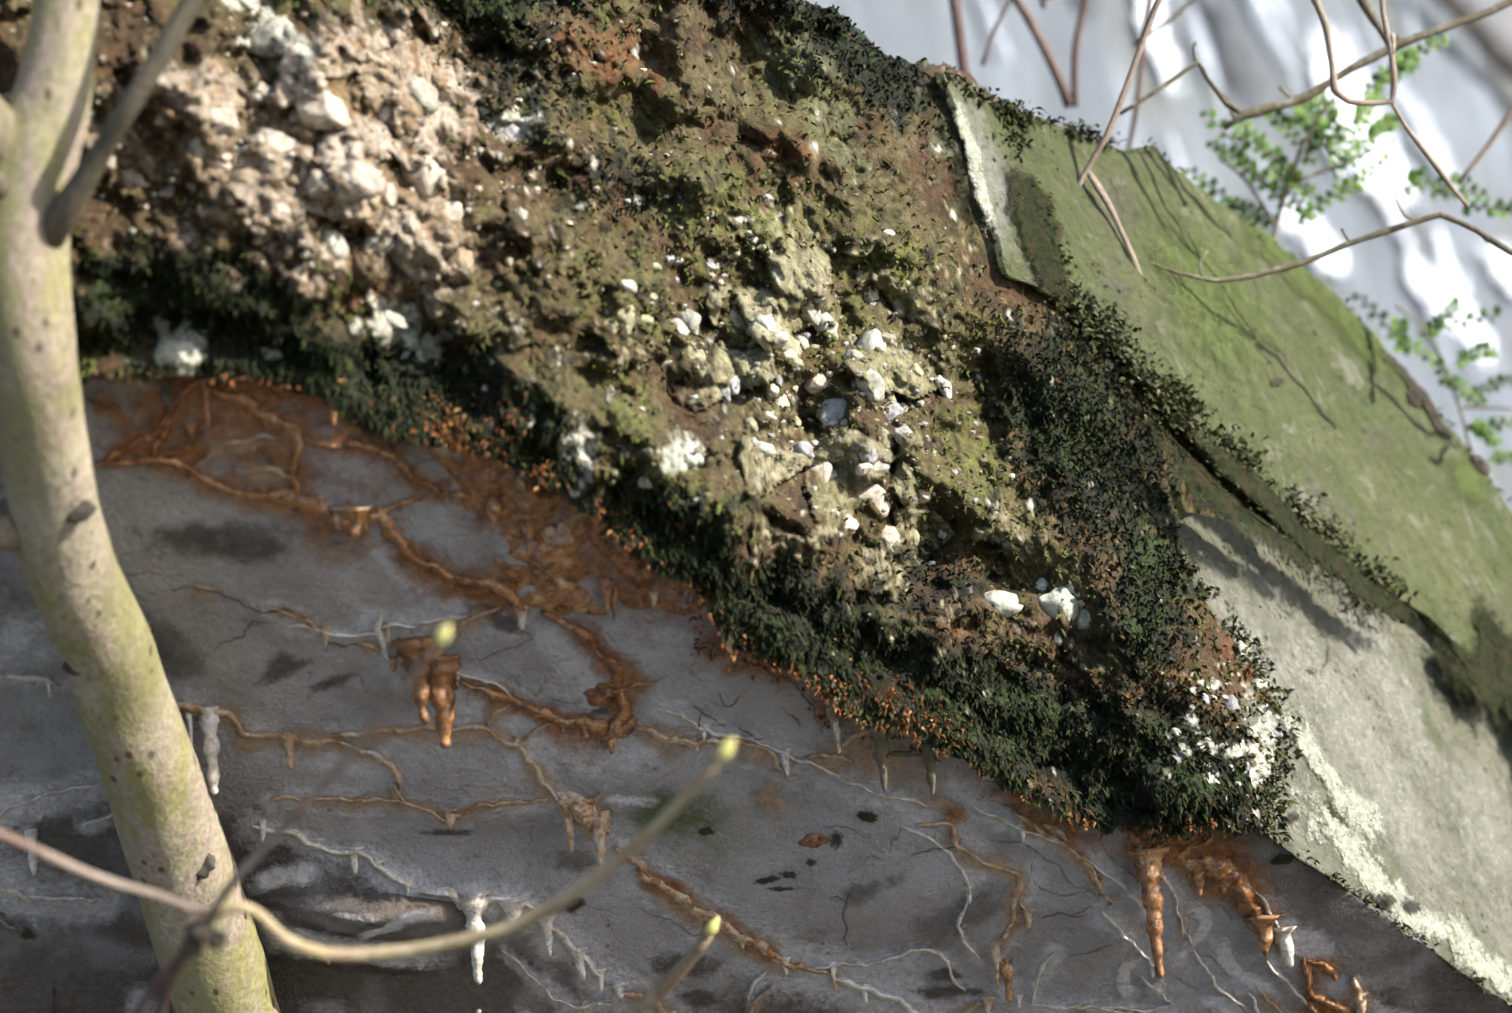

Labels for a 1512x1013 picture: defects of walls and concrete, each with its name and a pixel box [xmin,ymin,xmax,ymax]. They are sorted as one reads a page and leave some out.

crack [129,570,364,648]
corrosion [86,369,1097,855]
damp [176,671,562,836]
crack [0,911,47,940]
damp [0,777,103,927]
damp [252,820,413,894]
damp [502,914,719,1013]
corrosion [798,830,843,866]
damp [613,710,1173,1013]
crack [665,656,1308,1013]
corrosion [1120,817,1286,956]
corrosion [1300,957,1371,1013]